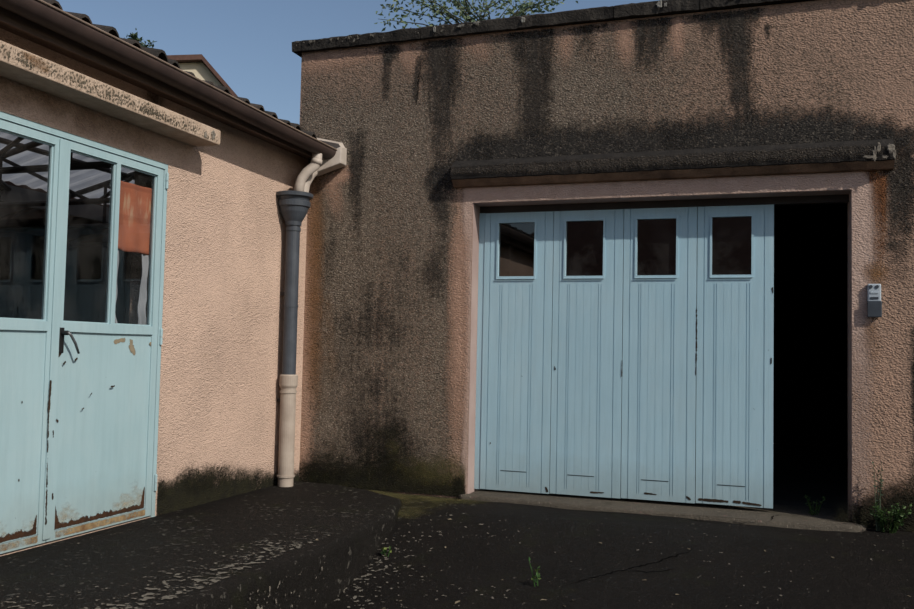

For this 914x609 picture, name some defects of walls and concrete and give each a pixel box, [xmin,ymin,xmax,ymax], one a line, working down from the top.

spalling [864,142,896,162]
leakage [881,148,914,262]
leakage [300,8,775,481]
spalling [114,338,136,355]
spalling [45,380,59,525]
rust [0,515,37,551]
rust [54,487,145,537]
leakage [834,465,914,532]